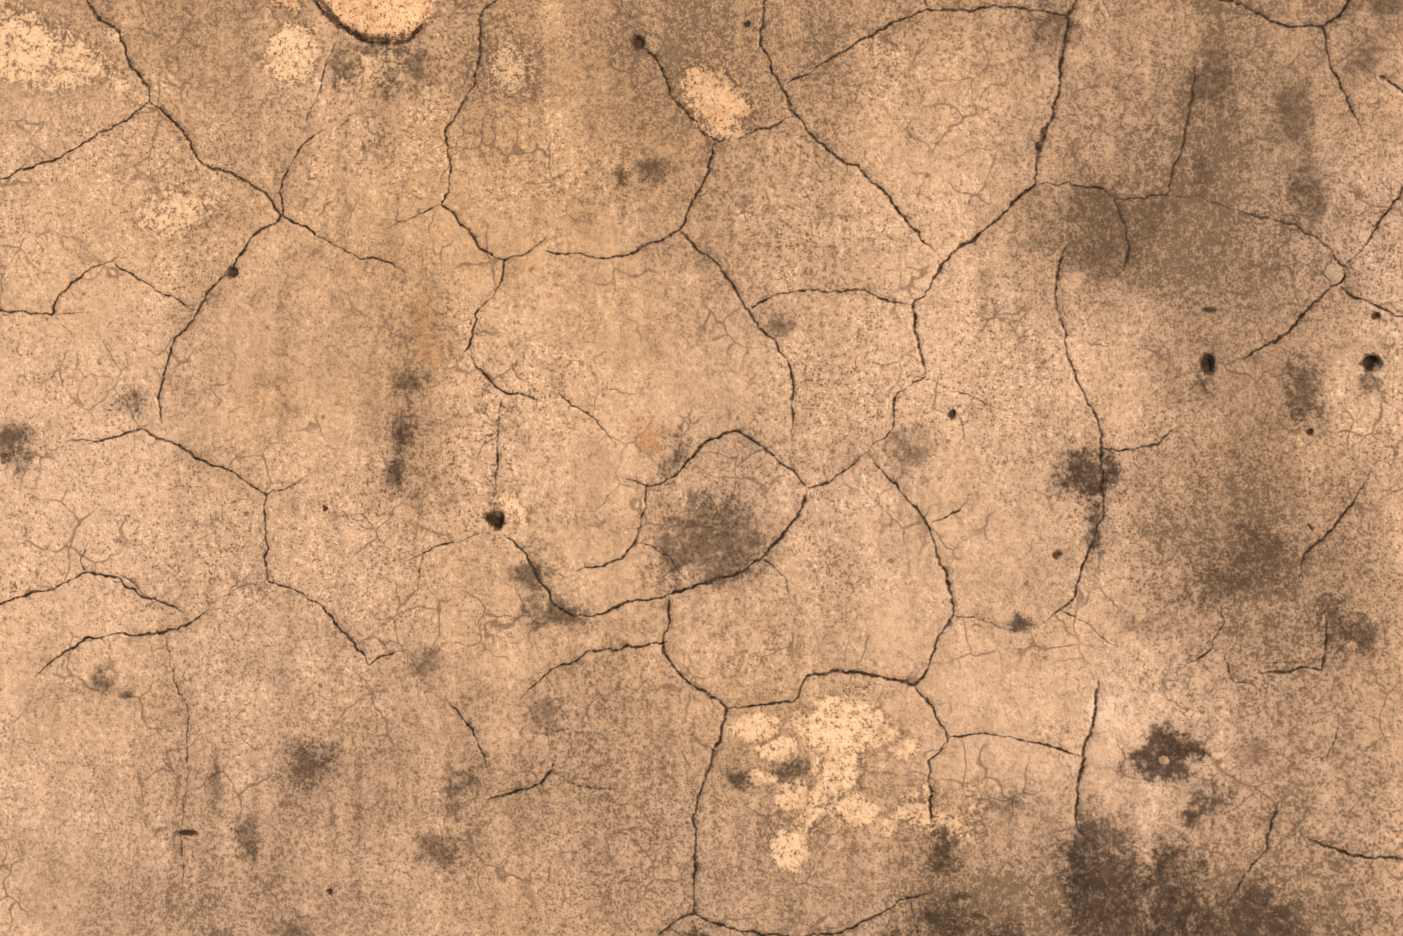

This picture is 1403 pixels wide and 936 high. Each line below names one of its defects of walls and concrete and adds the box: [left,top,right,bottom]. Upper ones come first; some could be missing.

peeling [260,0,322,87]
crack [313,0,423,45]
peeling [335,31,414,100]
peeling [680,63,755,140]
crack [0,0,395,674]
crack [398,0,1403,936]
leakage [1053,448,1125,548]
crack [172,668,190,771]
peeling [727,686,984,873]
leakage [1083,667,1132,749]
leakage [1120,722,1205,782]
leakage [1066,818,1303,936]